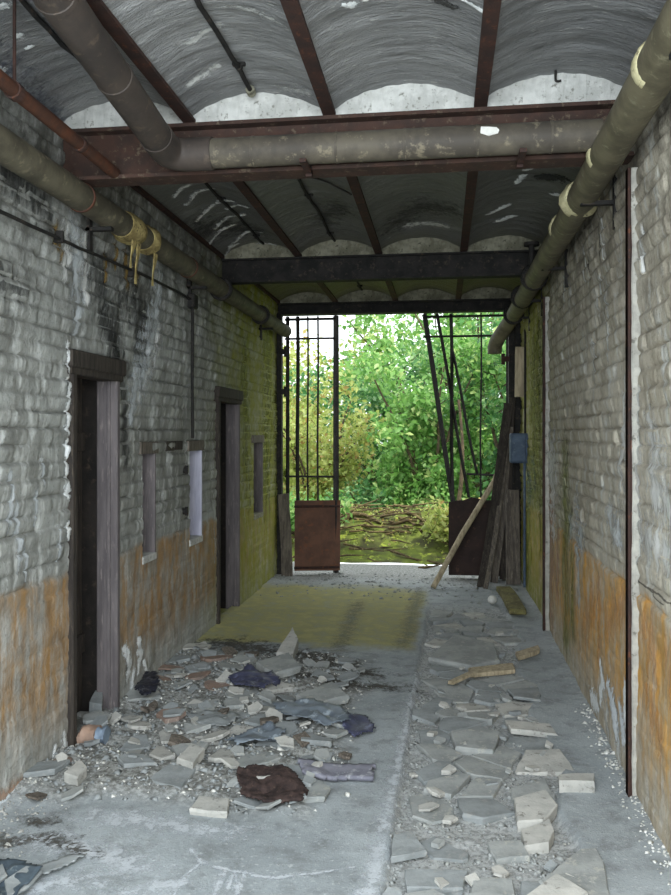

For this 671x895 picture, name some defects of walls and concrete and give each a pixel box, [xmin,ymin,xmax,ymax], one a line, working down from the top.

spalling [434,0,483,13]
water stain [526,335,585,644]
crack [638,580,671,605]